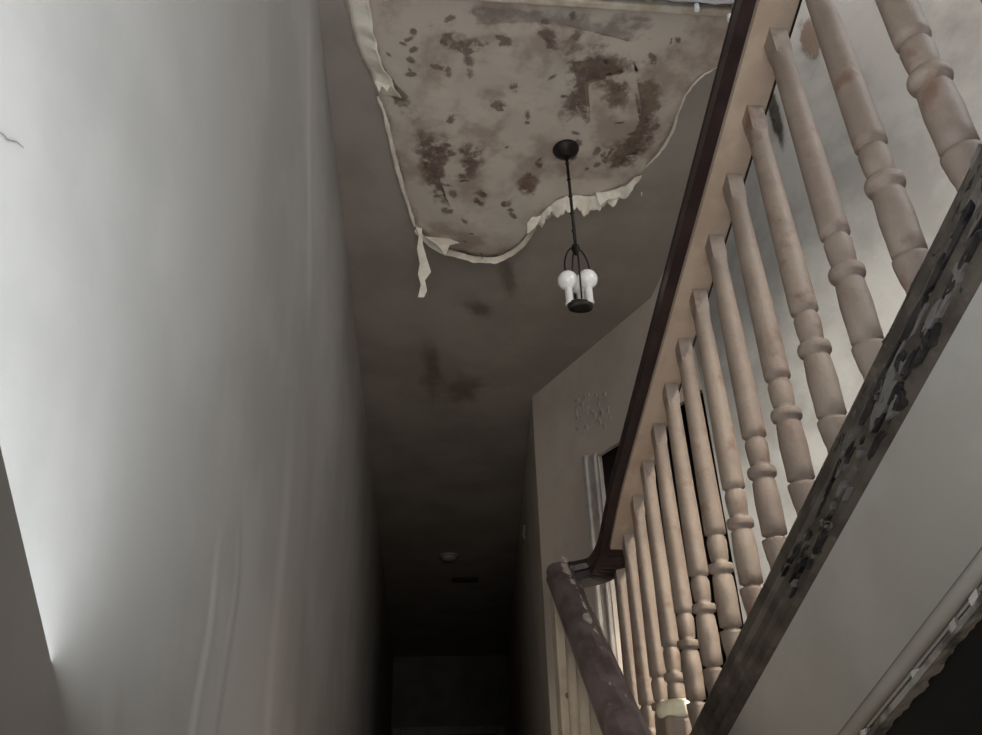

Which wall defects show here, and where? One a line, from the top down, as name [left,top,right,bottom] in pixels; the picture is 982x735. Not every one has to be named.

flaking render [344,0,729,298]
flaking render [837,547,982,735]